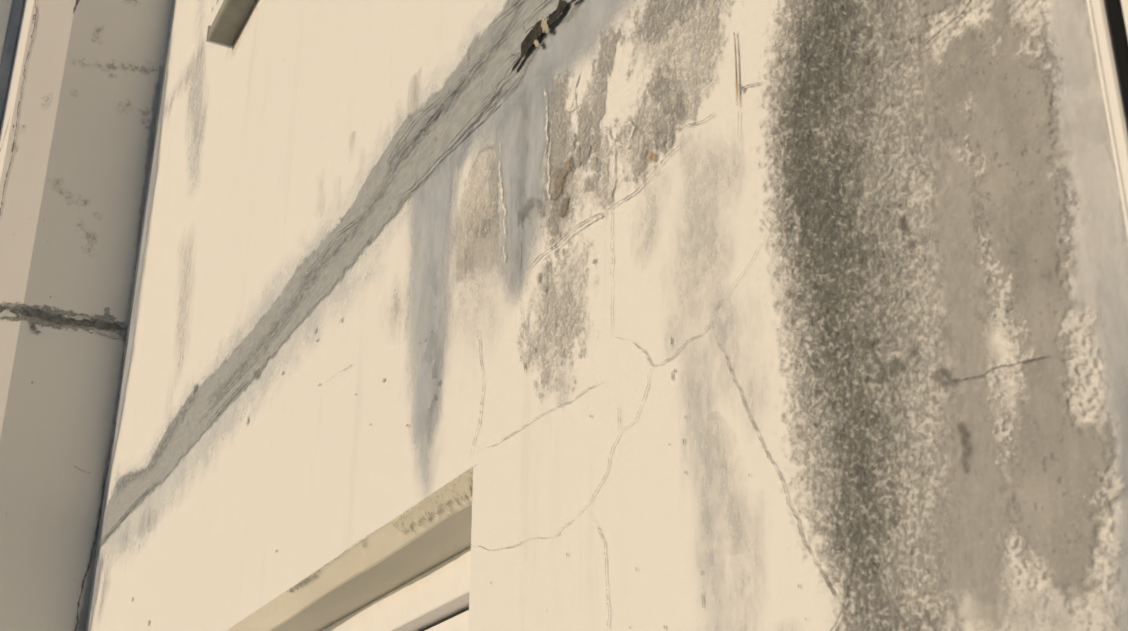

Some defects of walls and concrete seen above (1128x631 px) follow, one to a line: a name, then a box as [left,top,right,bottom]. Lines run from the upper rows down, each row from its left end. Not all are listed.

leakage [627,0,733,154]
leakage [456,146,507,279]
leakage [518,243,596,397]
crack [611,299,724,399]
leakage [758,0,961,631]
crack [75,336,155,631]
crack [725,354,882,631]